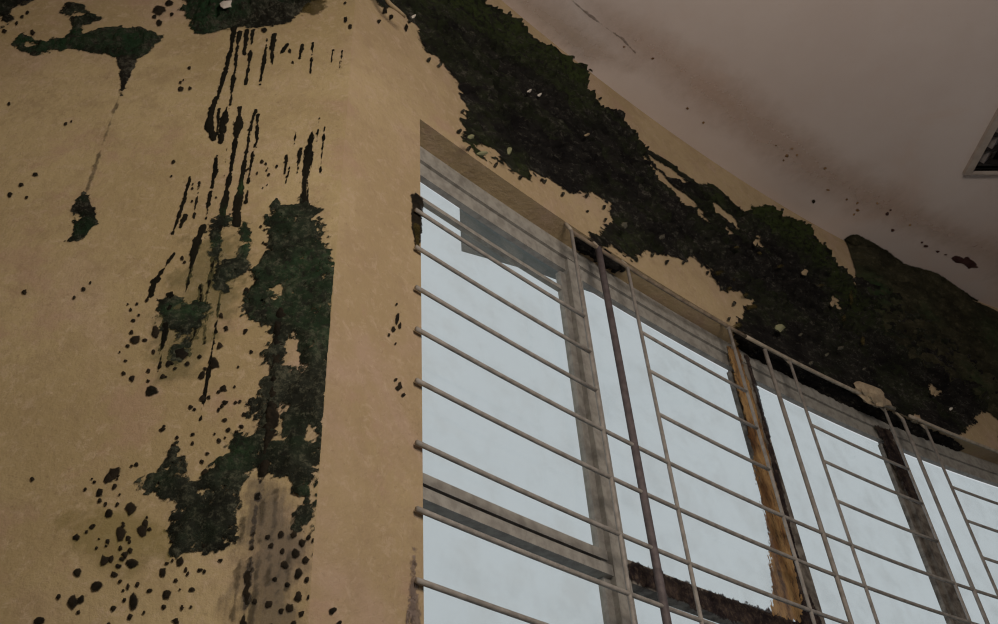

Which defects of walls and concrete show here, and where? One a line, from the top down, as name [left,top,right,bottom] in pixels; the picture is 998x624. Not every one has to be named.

damp [56,96,335,624]
damp [411,193,424,246]